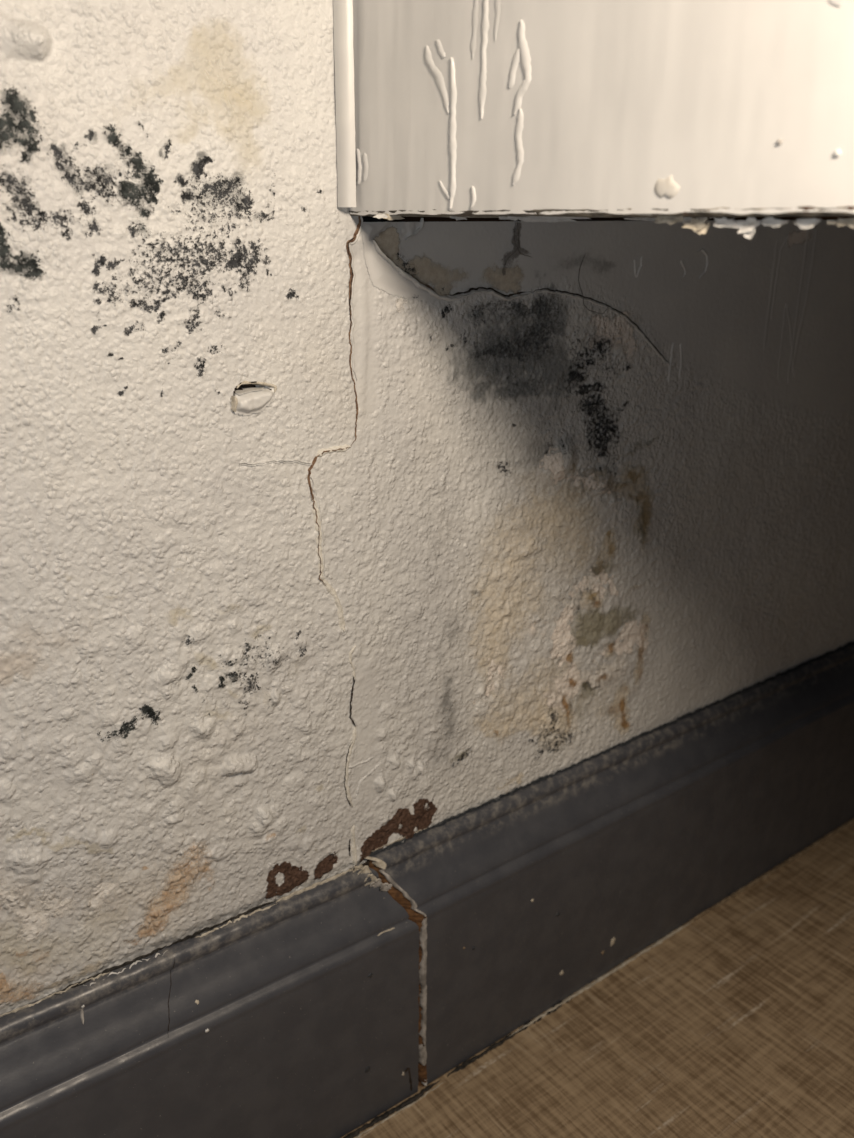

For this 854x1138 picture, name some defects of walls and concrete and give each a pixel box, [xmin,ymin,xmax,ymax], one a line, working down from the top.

water stain [0,86,276,364]
hole [230,381,277,416]
crack [239,216,427,1086]
peeling [362,214,527,312]
water stain [429,296,653,758]
peeling [624,216,854,239]